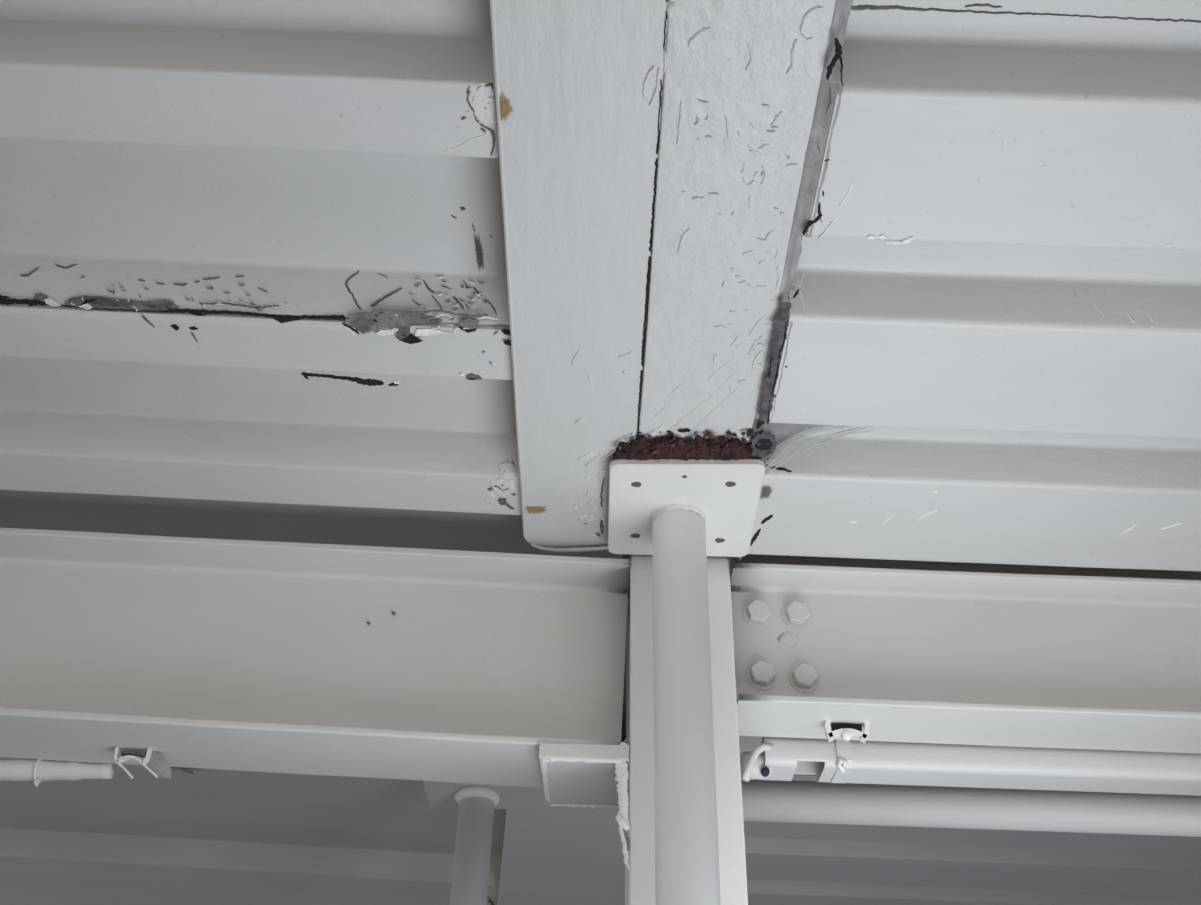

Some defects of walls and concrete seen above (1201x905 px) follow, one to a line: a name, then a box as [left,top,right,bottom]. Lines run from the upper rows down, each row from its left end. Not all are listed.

crack [851,3,1201,23]
rust [499,97,512,120]
peeling [33,293,179,328]
peeling [342,309,511,346]
spalling [459,351,495,380]
rust [612,428,755,461]